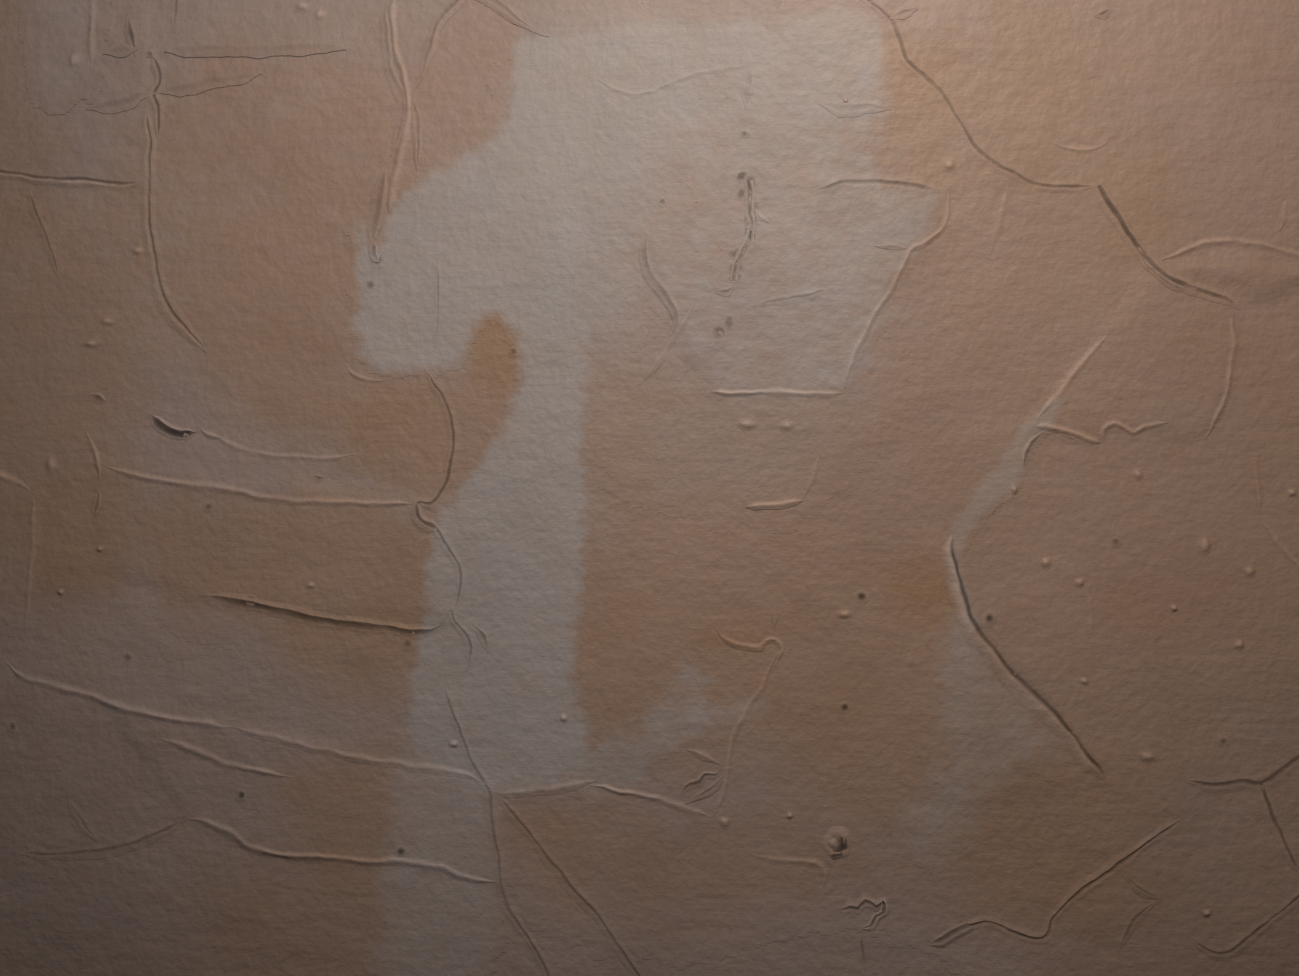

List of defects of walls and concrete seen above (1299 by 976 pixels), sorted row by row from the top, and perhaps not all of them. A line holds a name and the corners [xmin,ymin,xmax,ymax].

crack [0,166,139,283]
crack [710,170,835,343]
crack [809,173,944,196]
crack [860,0,1239,309]
crack [200,259,490,672]
crack [1181,747,1299,961]